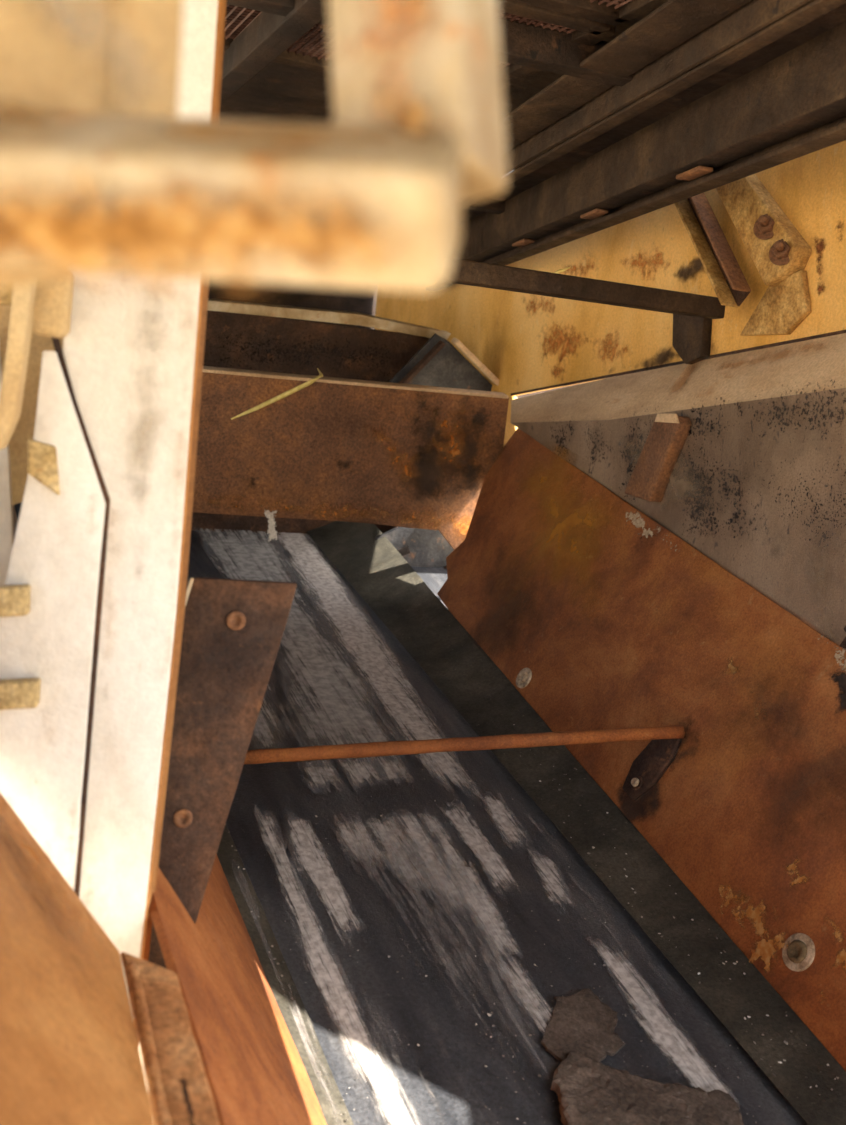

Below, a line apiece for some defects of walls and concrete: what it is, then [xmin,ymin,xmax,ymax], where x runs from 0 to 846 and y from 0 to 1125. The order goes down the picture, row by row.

rust [0,179,385,285]
rust [543,327,580,377]
peeling [819,635,846,673]
peeling [719,885,789,970]